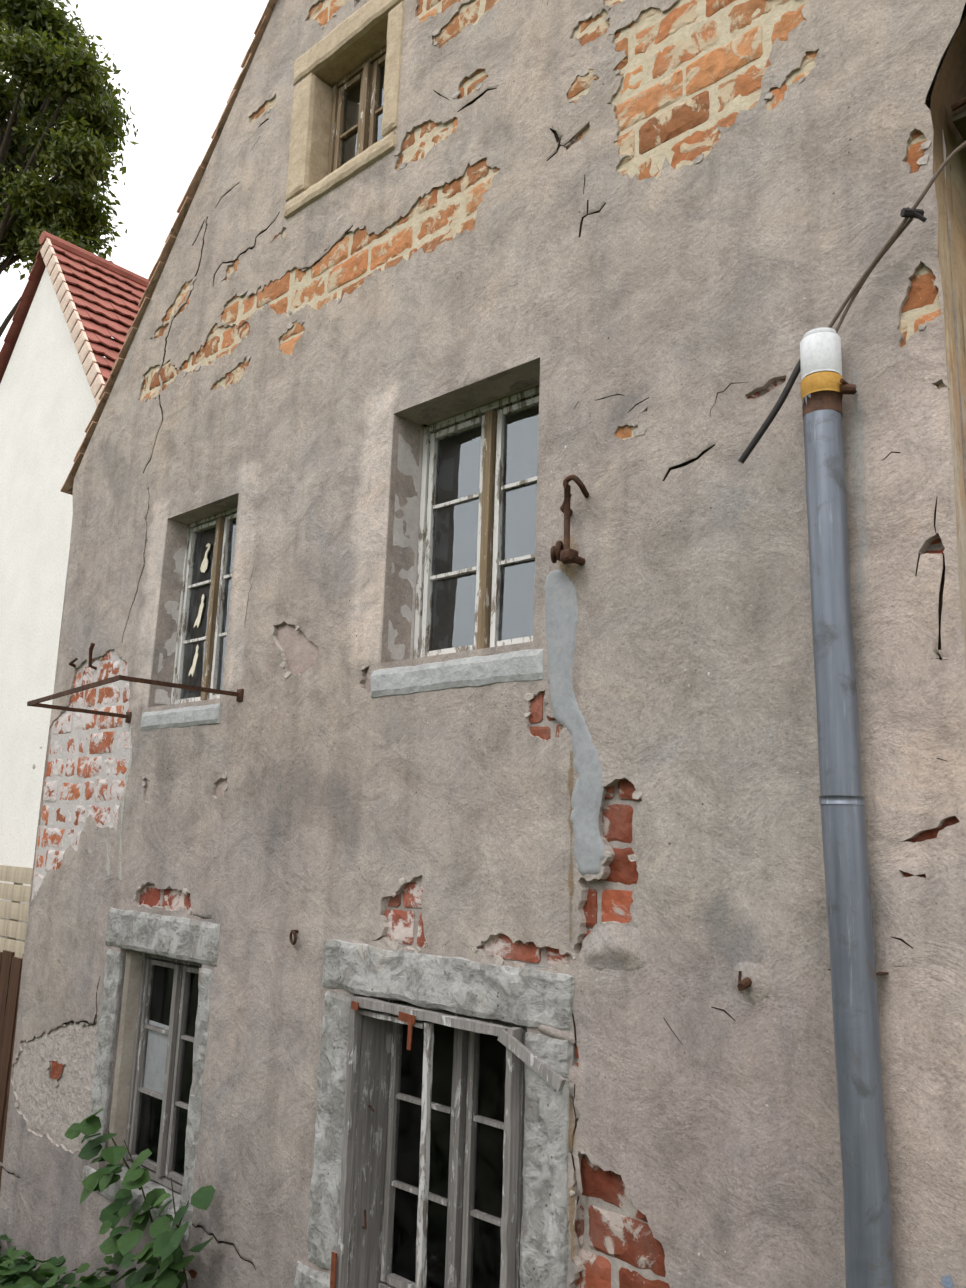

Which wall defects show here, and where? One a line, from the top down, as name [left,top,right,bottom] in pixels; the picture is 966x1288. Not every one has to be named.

flaking render [564,0,819,180]
flaking render [138,157,500,402]
flaking render [897,261,941,348]
crack [121,181,280,642]
crack [908,498,950,660]
flaking render [29,649,150,906]
flaking render [524,689,563,741]
flaking render [133,882,192,914]
flaking render [372,875,428,953]
flaking render [472,777,642,970]
crack [179,1206,258,1270]
flaking render [569,1151,670,1288]